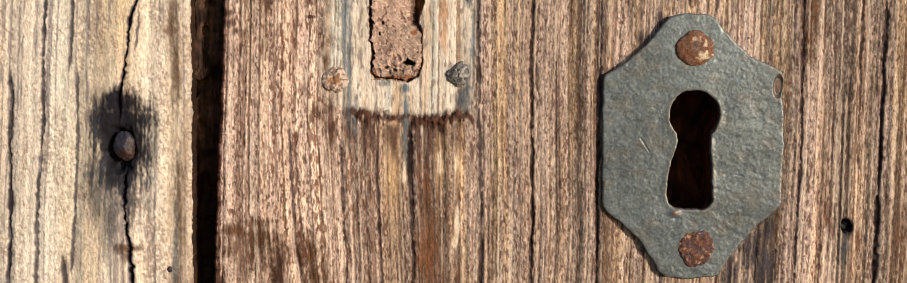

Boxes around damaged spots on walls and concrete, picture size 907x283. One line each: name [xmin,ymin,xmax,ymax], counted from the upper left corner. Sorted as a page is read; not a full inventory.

crack [118,5,136,117]
leakage [89,86,156,257]
crack [123,174,134,283]